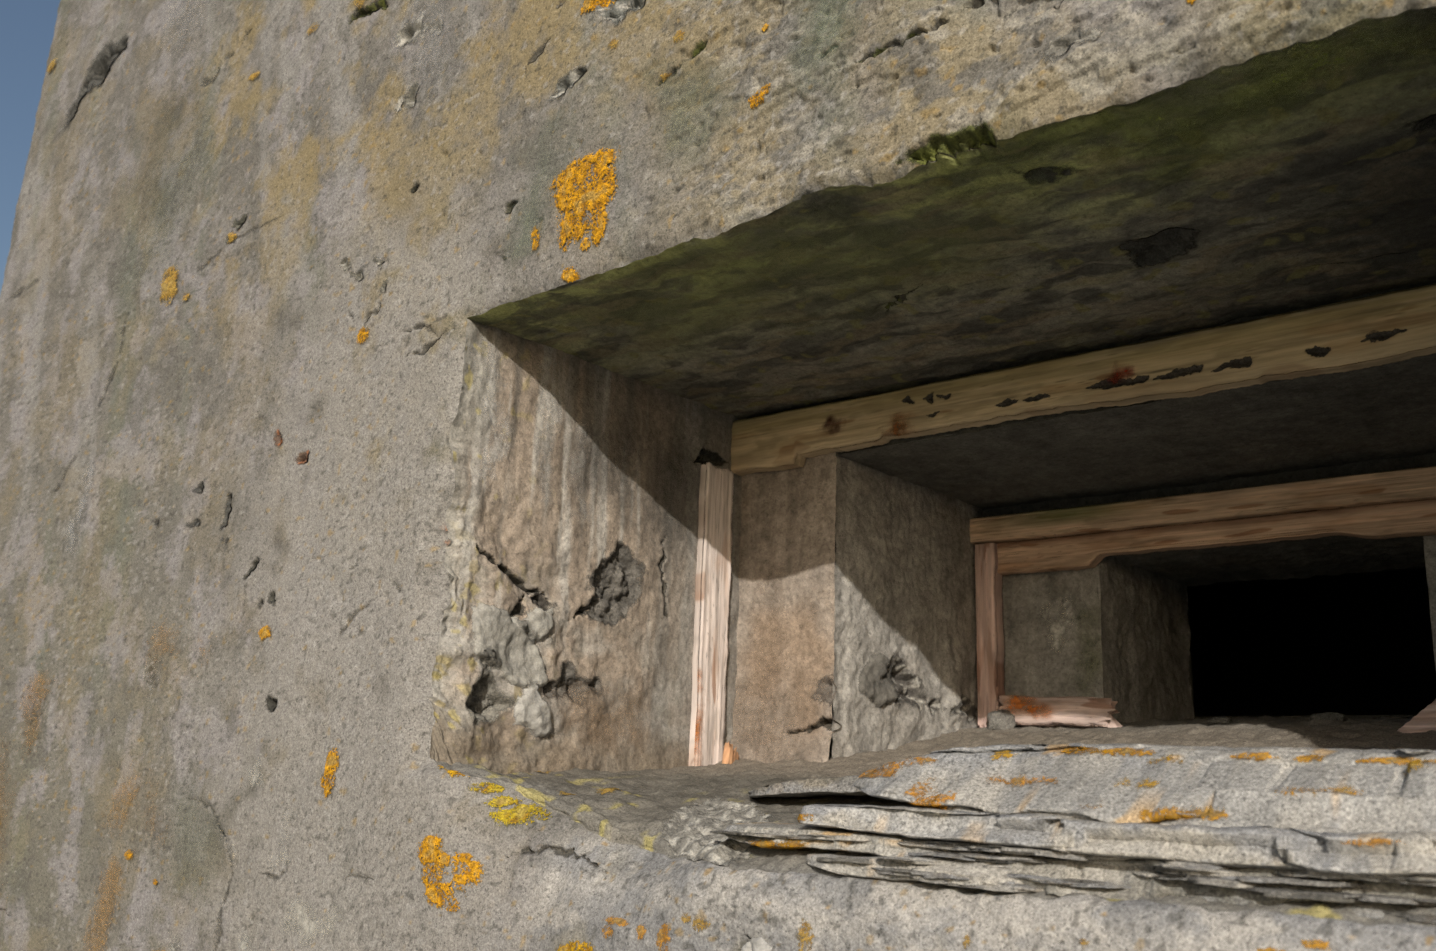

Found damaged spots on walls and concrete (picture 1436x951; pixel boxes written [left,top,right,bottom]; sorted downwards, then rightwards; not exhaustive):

spalling [595,0,646,25]
crack [821,0,999,63]
spalling [64,34,127,127]
spalling [550,66,587,98]
crack [476,545,587,617]
spalling [578,541,646,626]
peeling [466,602,603,726]
spalling [874,650,977,722]
peeling [741,936,773,951]